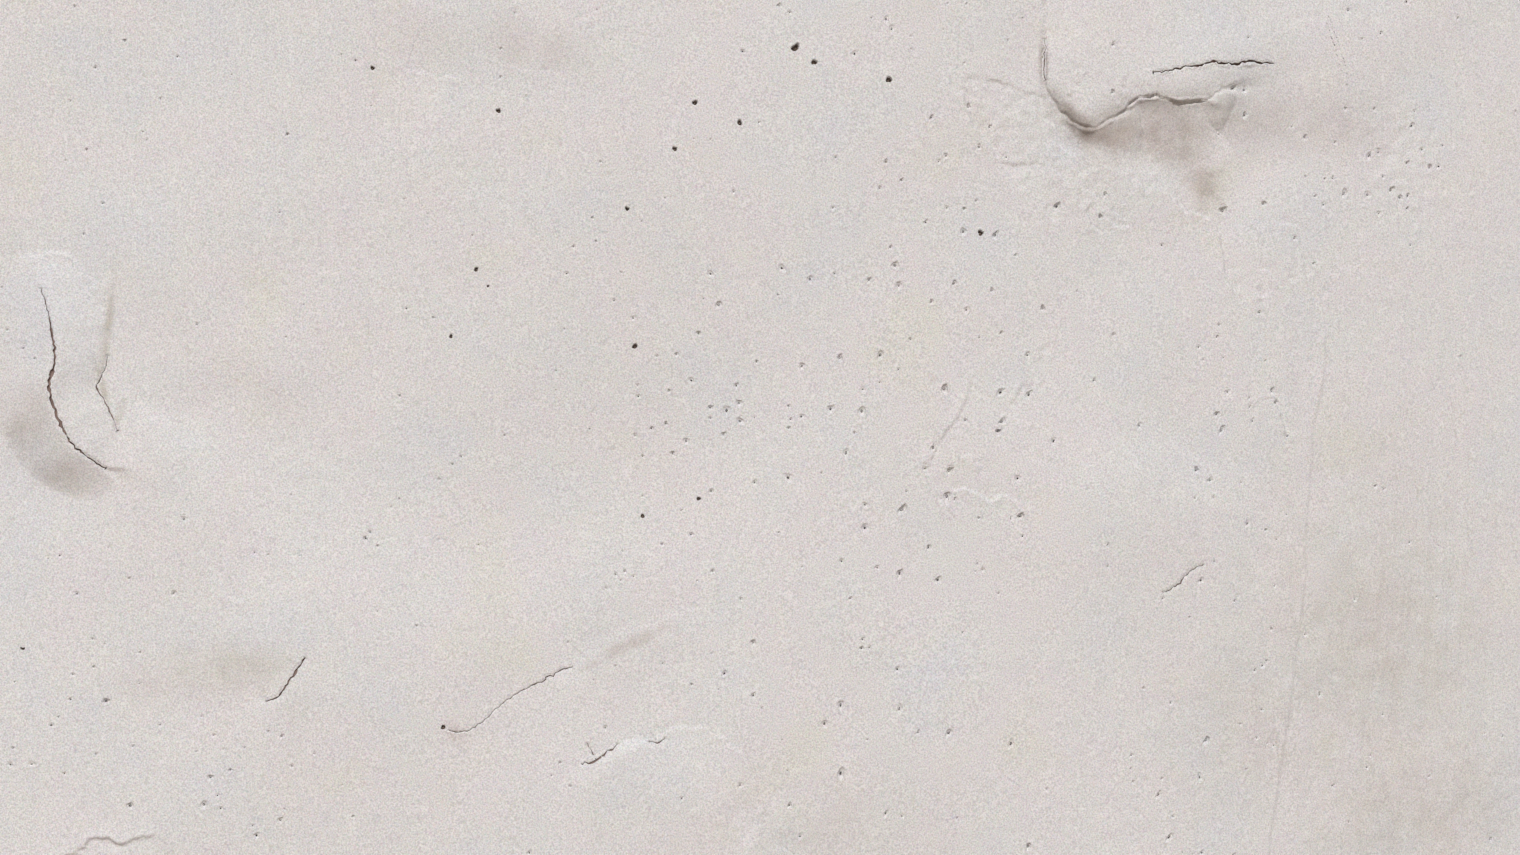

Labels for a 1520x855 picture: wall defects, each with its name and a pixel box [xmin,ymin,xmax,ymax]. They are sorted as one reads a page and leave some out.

spalling [925,0,1414,326]
crack [266,657,306,703]
crack [446,665,572,735]